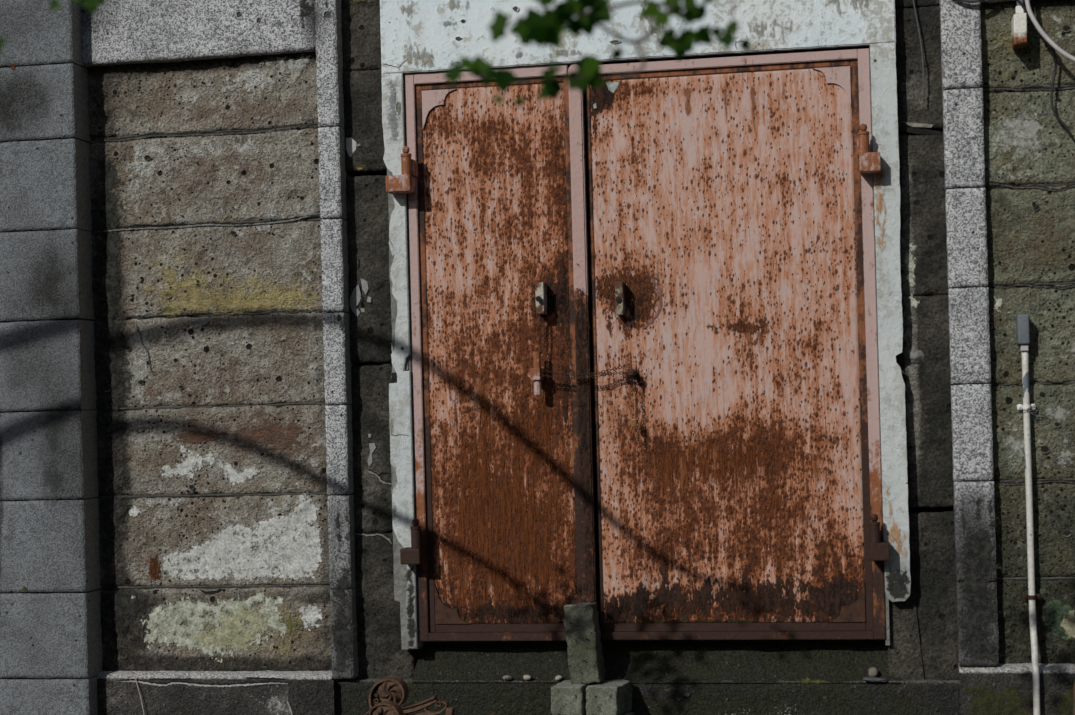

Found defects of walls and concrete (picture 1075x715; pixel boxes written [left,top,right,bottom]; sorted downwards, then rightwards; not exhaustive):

rust [592,80,621,128]
rust [684,89,692,114]
rust [434,252,867,628]
water stain [163,493,324,582]